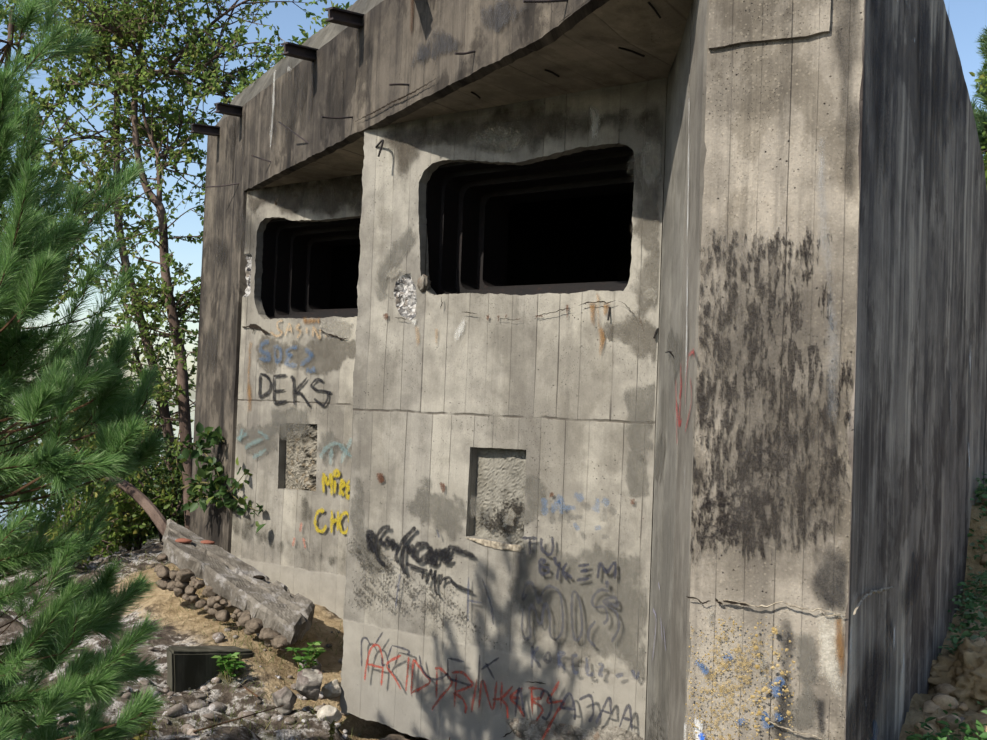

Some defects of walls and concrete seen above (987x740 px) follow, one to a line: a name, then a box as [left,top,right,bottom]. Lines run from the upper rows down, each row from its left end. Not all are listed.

spalling [388,267,431,320]
water stain [684,227,853,561]
spalling [465,537,522,552]
crack [686,586,894,616]
spalling [504,718,643,740]